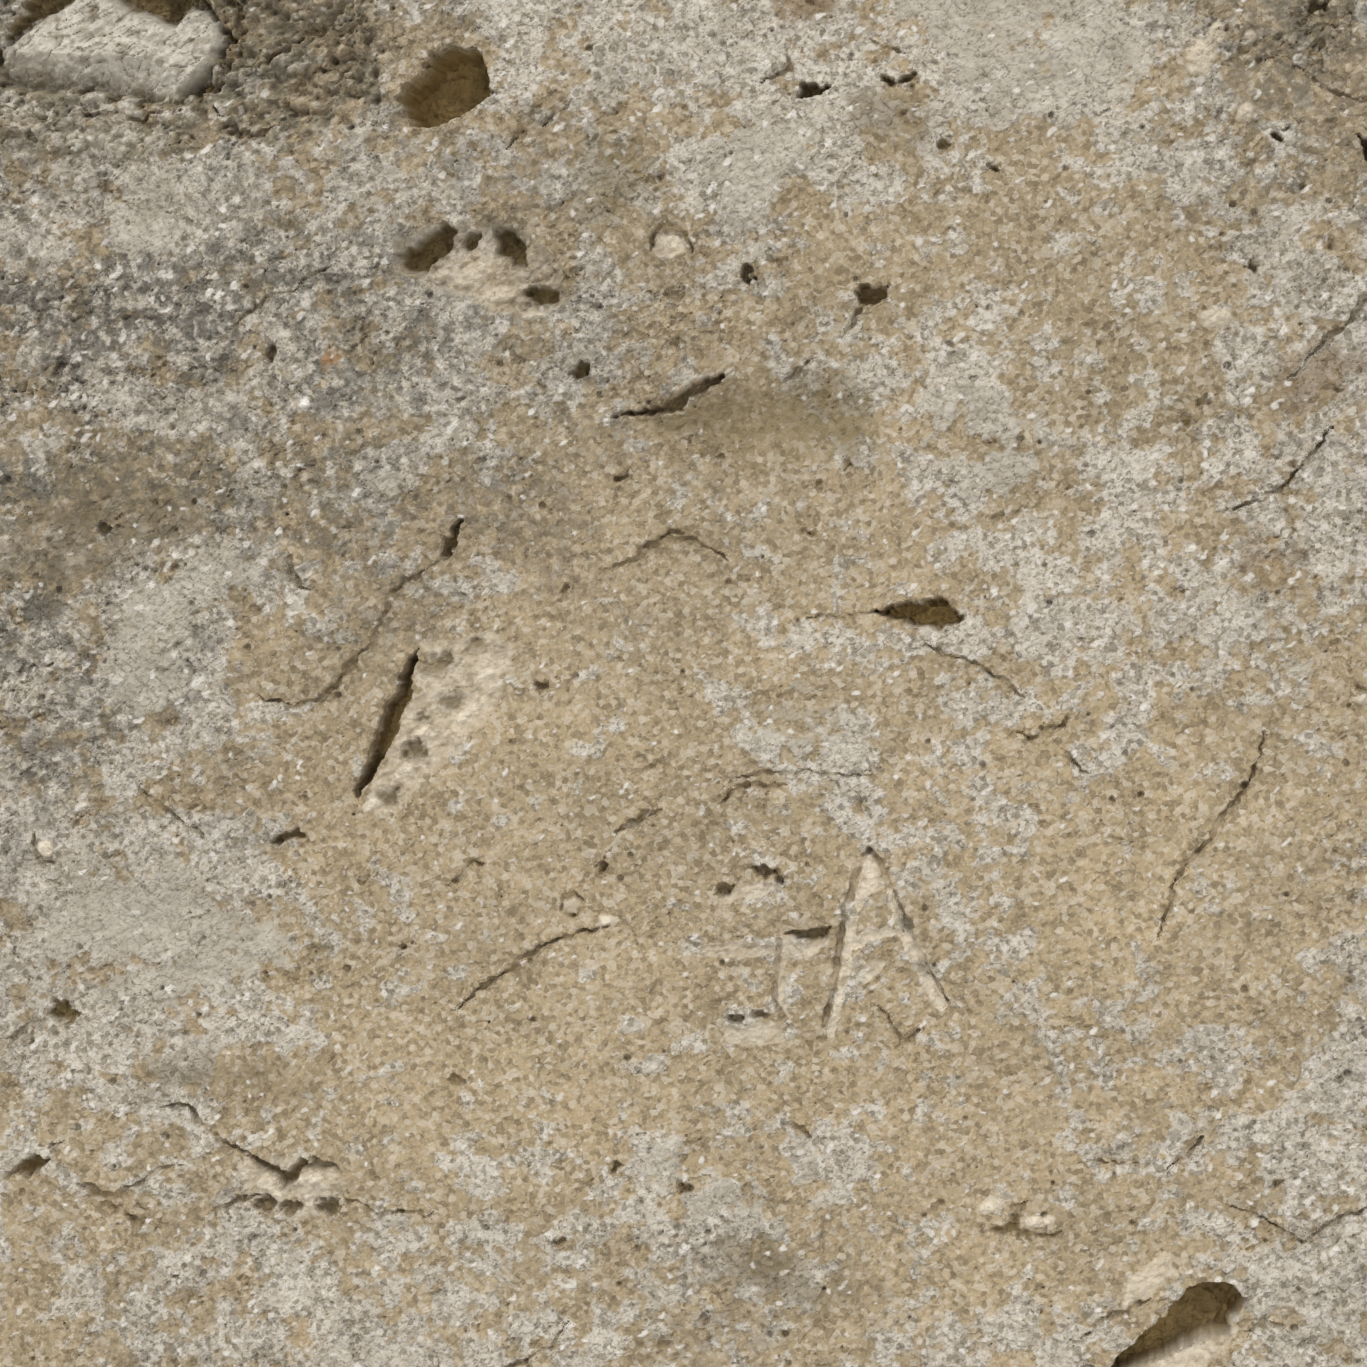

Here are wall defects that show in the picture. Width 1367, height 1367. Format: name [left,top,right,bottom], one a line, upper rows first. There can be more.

spalling [0,0,409,173]
crack [598,525,729,572]
crack [253,552,444,711]
crack [1157,729,1267,940]
crack [451,923,611,1012]
spalling [1120,1249,1180,1310]
spalling [1148,1321,1239,1367]